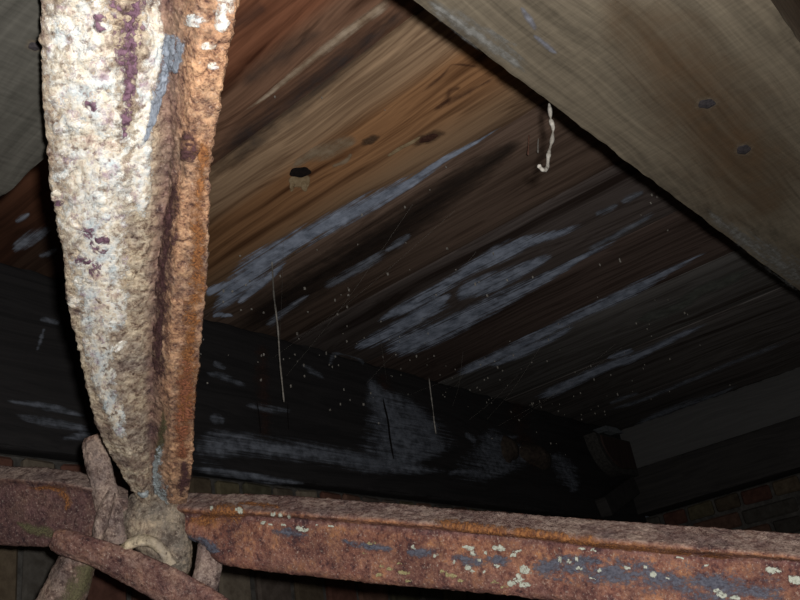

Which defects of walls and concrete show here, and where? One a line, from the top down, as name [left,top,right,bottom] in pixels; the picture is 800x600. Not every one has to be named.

rust [151,179,179,384]
rust [156,131,209,497]
leakage [206,132,515,325]
leakage [352,215,651,363]
leakage [460,254,701,375]
leakage [538,326,702,398]
leakage [201,468,298,484]
leakage [203,382,449,473]
rust [439,518,733,559]